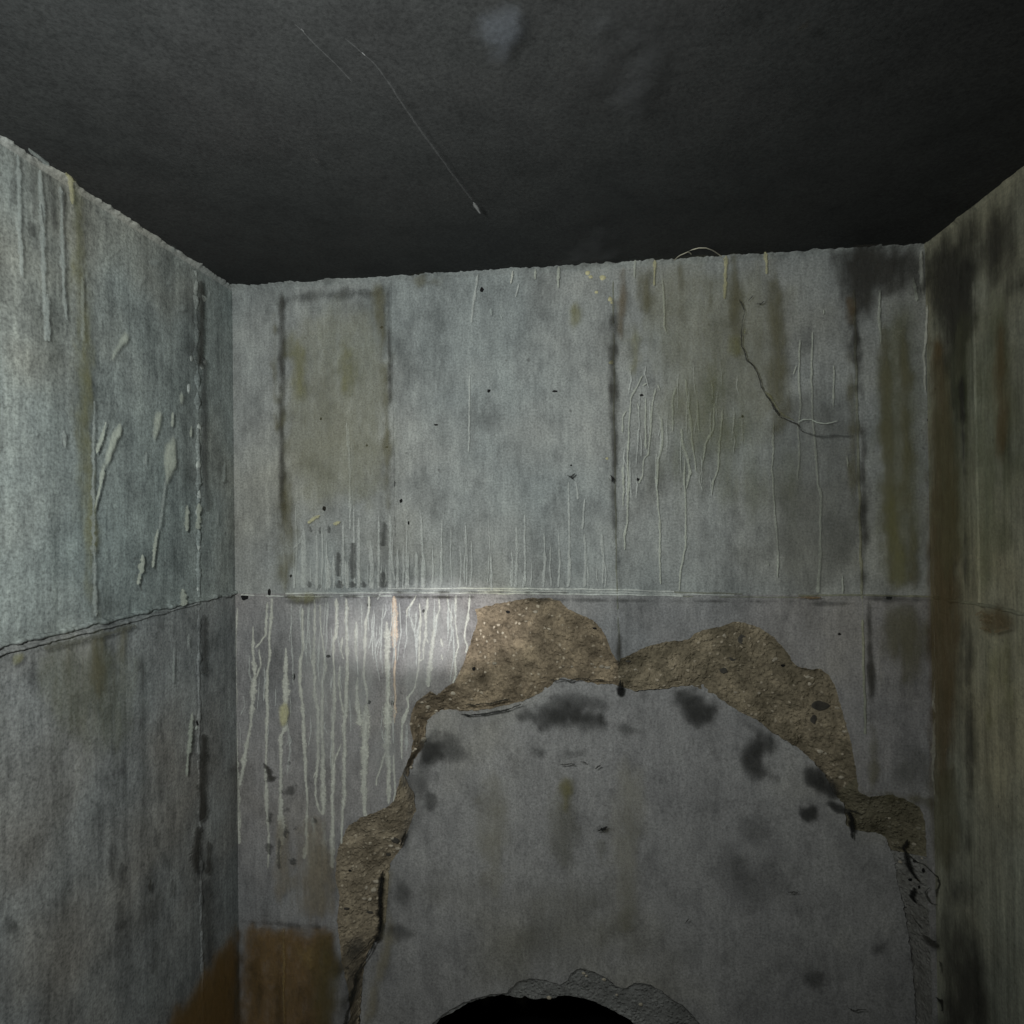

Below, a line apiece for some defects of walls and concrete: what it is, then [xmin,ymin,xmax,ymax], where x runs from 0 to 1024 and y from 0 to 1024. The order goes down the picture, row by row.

water stain [609,344,617,401]
crack [739,297,836,433]
water stain [841,212,1011,460]
water stain [91,413,121,510]
water stain [137,412,176,585]
water stain [184,490,202,531]
water stain [605,376,723,590]
water stain [236,591,471,868]
spalling [335,598,933,1024]
water stain [676,691,715,726]
water stain [741,736,771,776]
water stain [799,768,850,821]